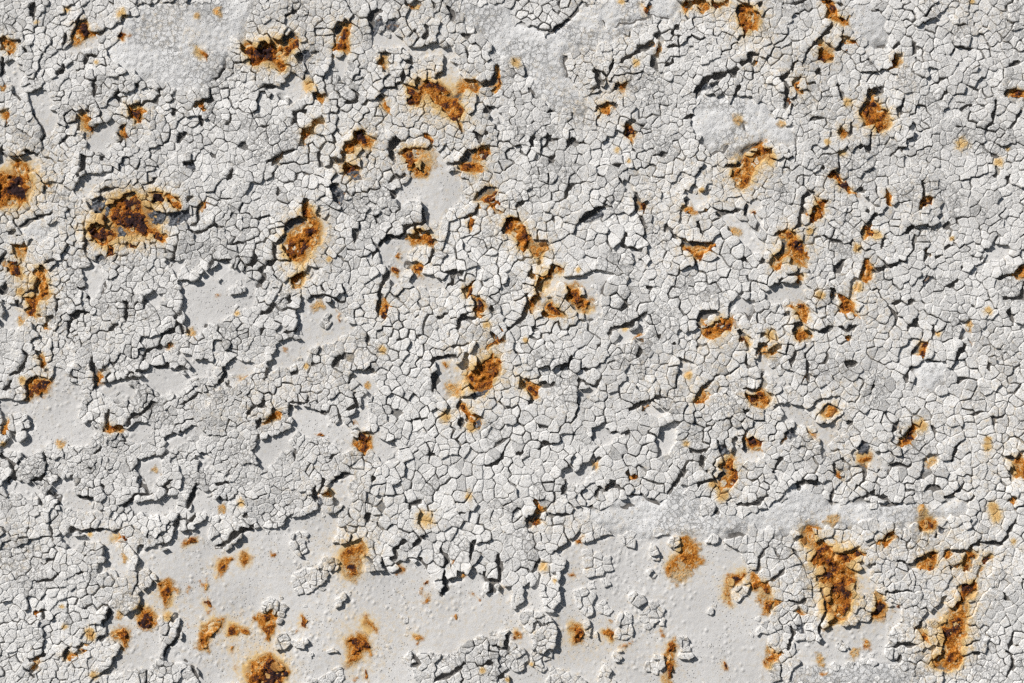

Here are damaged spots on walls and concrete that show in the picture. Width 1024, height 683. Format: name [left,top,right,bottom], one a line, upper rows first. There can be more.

corrosion [406,66,505,138]
corrosion [89,192,182,257]
crack [0,0,1024,543]
crack [0,176,278,683]
corrosion [111,577,290,683]
peeling [56,474,780,683]
crack [332,448,529,597]
crack [386,616,548,683]
crack [748,524,835,683]
corrosion [800,515,899,630]
crack [812,495,1024,683]
corrosion [917,550,990,672]